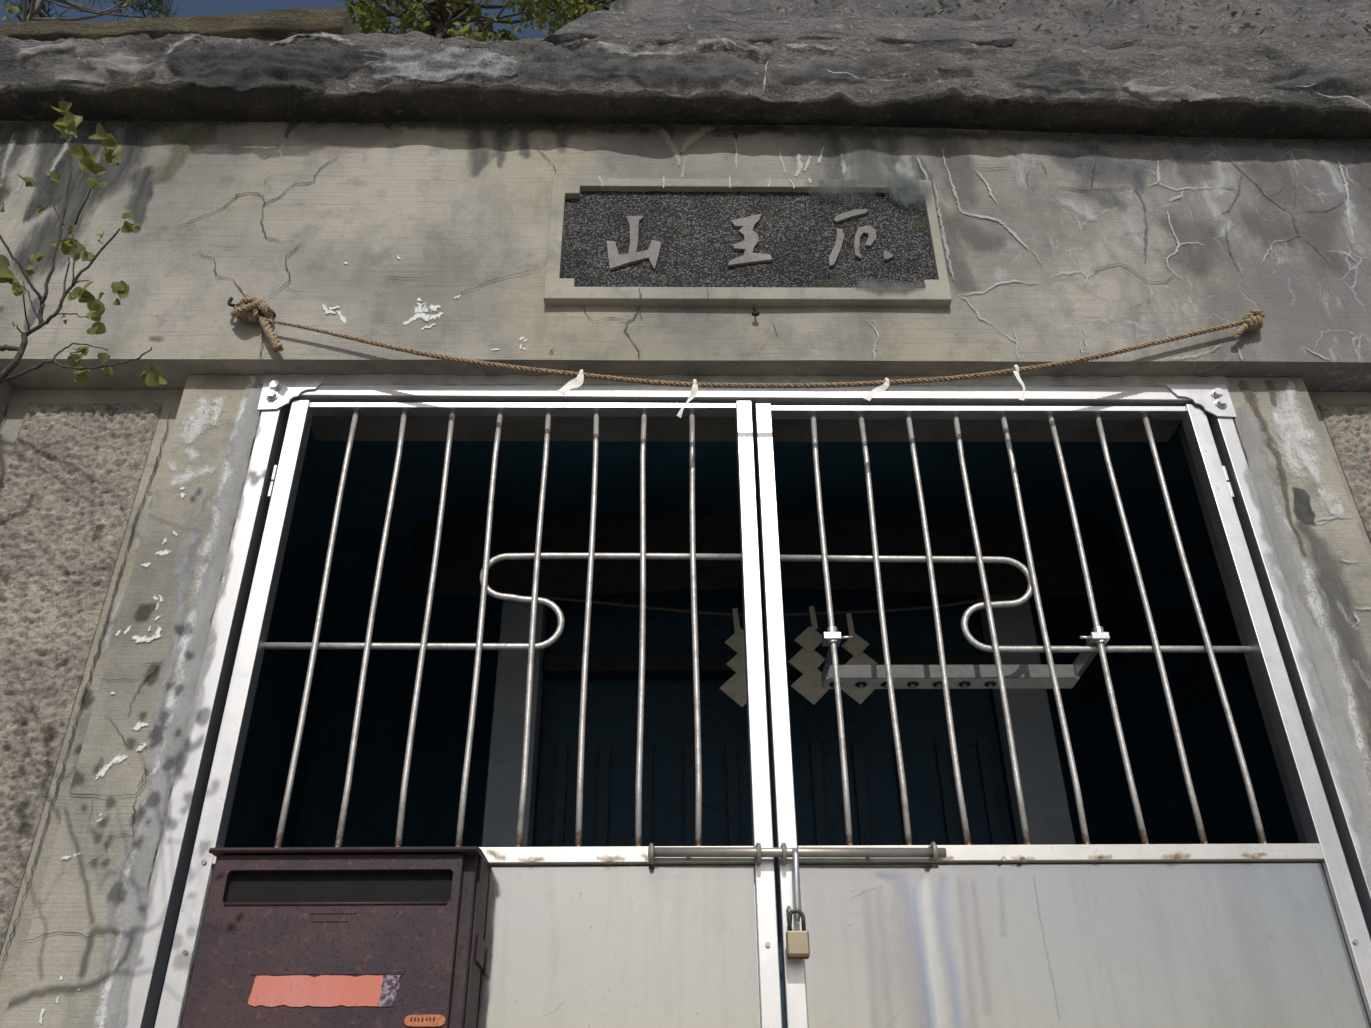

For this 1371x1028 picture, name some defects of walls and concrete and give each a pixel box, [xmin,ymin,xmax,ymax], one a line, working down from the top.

leakage [0,120,248,278]
crack [177,158,336,297]
leakage [280,121,1371,269]
leakage [938,215,999,290]
crack [917,142,1359,360]
peeling [322,304,346,323]
peeling [402,295,460,330]
crack [583,288,642,363]
peeling [116,595,163,643]
leakage [1239,381,1371,886]
peeling [95,721,148,780]